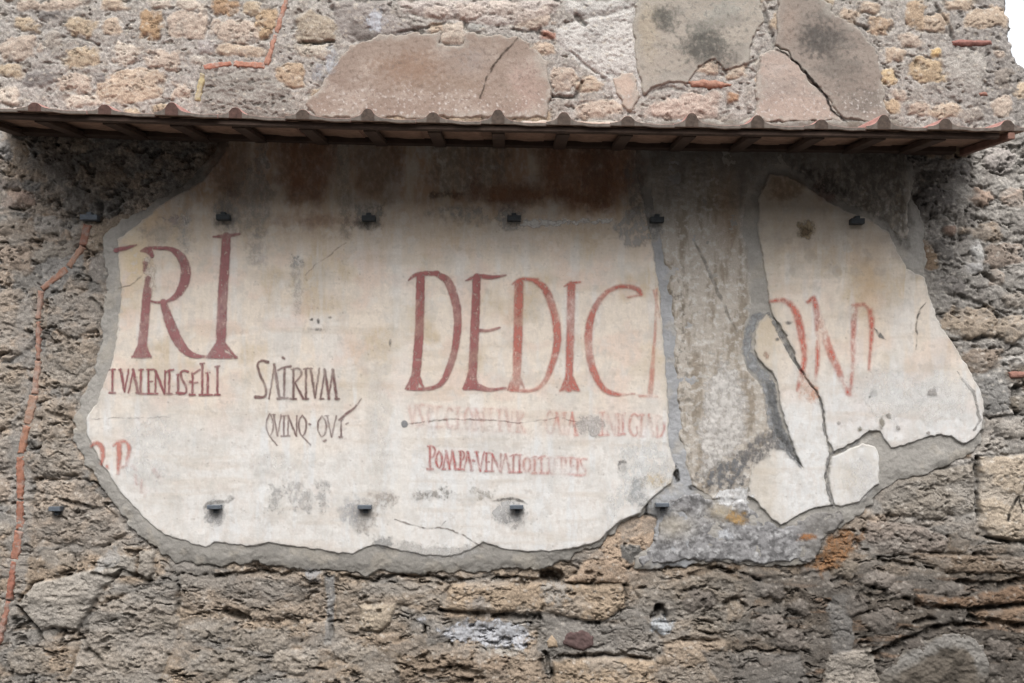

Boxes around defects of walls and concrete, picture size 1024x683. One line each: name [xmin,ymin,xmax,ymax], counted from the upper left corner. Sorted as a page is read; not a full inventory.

crack [480,37,518,98]
crack [776,49,847,122]
spalling [797,220,815,239]
spalling [743,313,801,468]
crack [767,312,860,508]
crack [957,371,982,431]